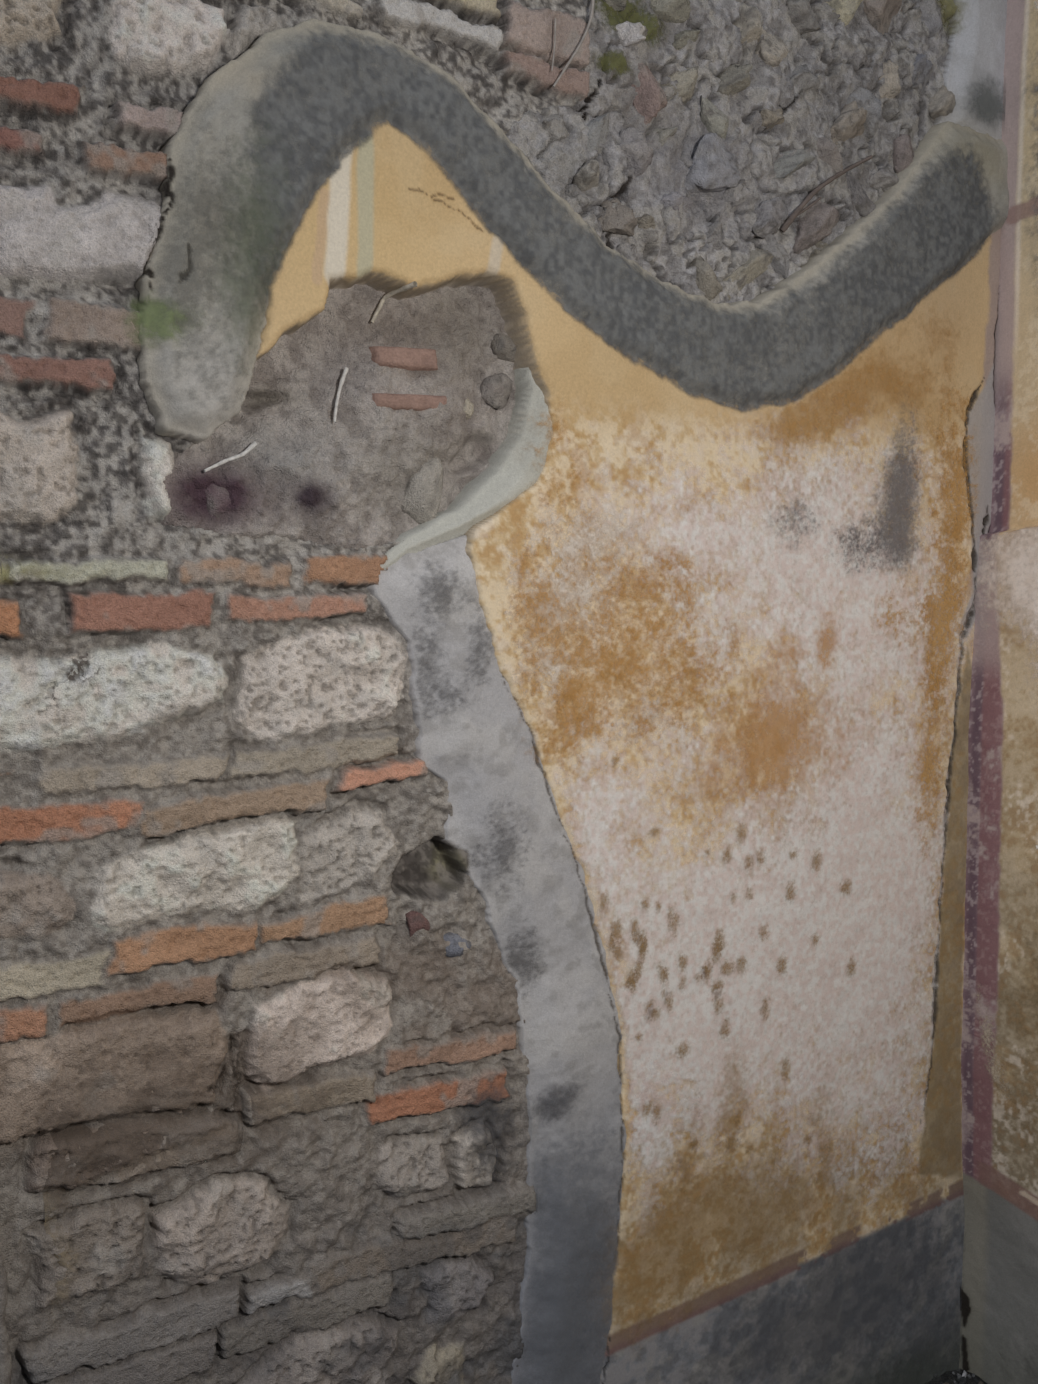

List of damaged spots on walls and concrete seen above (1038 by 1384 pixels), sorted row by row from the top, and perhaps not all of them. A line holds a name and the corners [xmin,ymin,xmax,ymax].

damp [239,35,994,411]
spalling [506,0,956,304]
damp [973,81,1005,123]
spalling [161,284,516,550]
damp [505,422,961,1215]
crack [920,293,999,1124]
damp [976,527,1038,640]
damp [464,1094,513,1169]